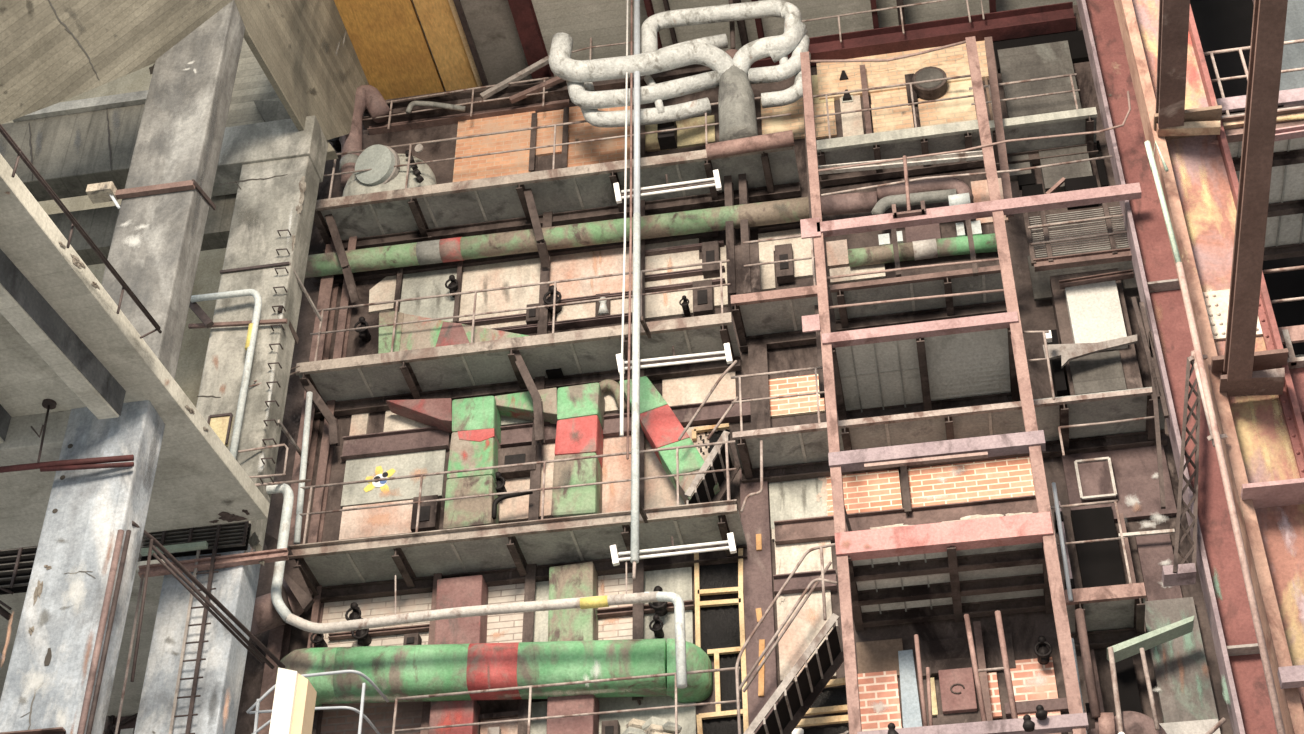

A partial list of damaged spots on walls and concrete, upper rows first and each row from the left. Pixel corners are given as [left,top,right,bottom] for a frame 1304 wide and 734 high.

crack [48,0,100,80]